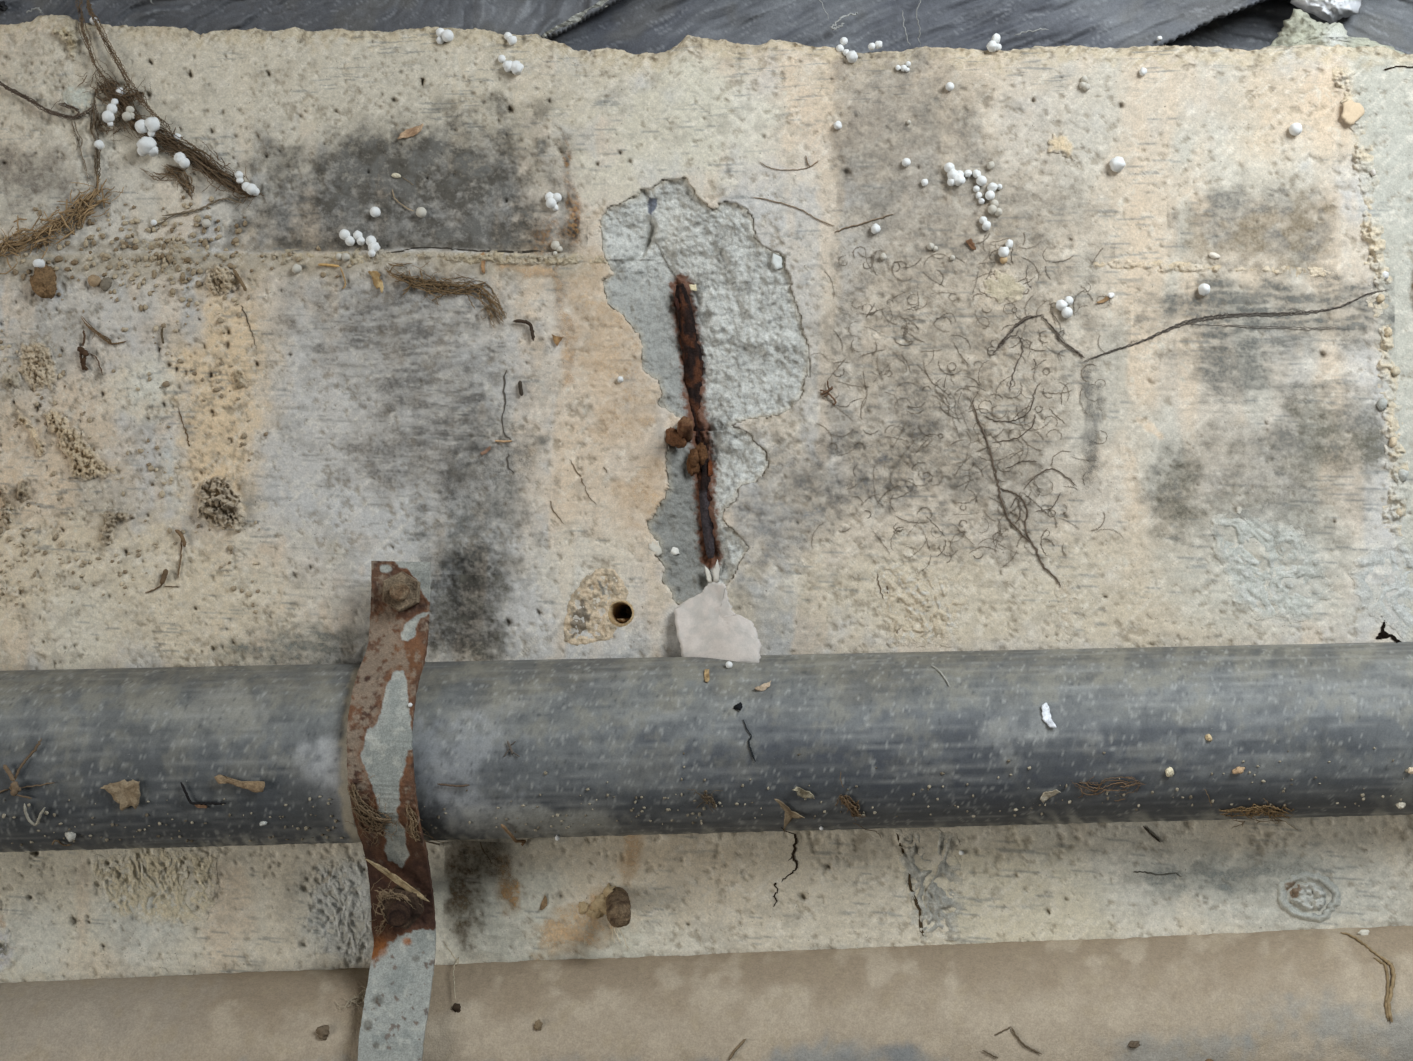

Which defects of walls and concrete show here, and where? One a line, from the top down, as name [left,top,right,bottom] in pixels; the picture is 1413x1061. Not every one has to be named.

damp [236,115,588,251]
damp [1208,193,1328,266]
damp [1163,276,1395,393]
damp [317,283,545,661]
rust [666,427,708,476]
spalling [600,178,811,663]
damp [1154,461,1201,520]
damp [1258,400,1386,488]
damp [232,627,356,664]
crack [773,827,798,907]